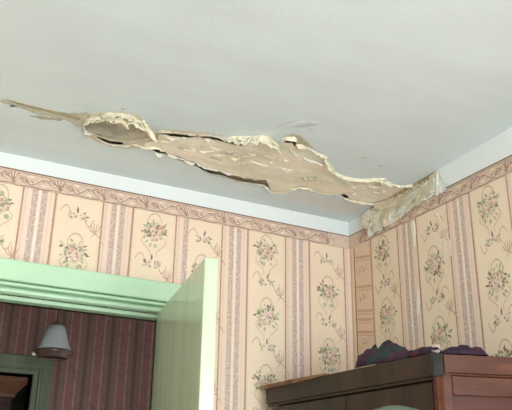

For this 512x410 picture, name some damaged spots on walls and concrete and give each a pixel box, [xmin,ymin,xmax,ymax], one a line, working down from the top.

flaking render [83,108,447,238]